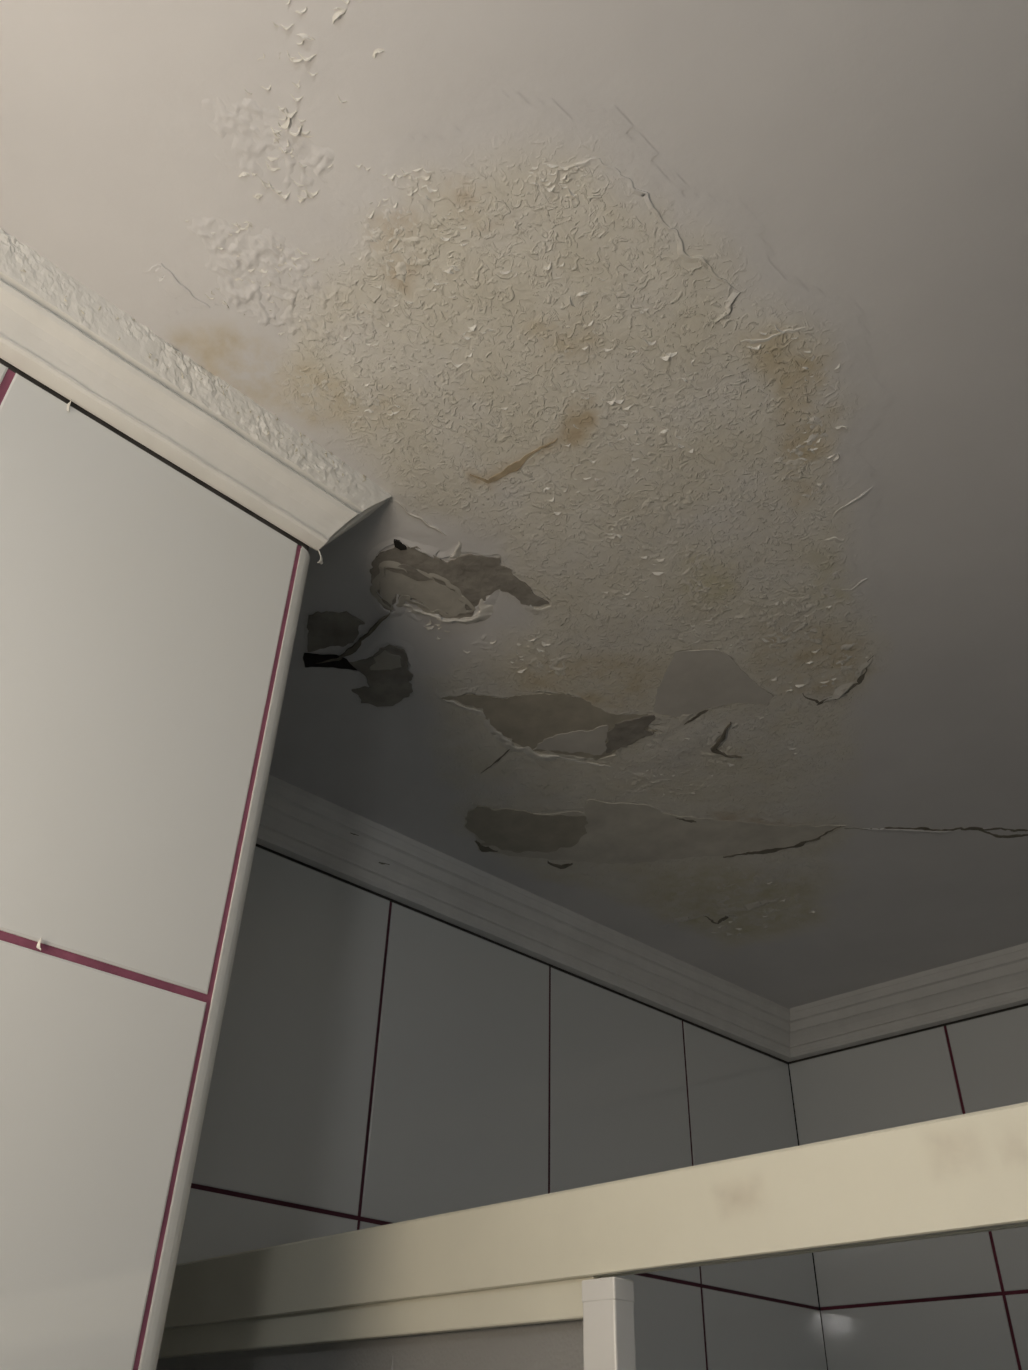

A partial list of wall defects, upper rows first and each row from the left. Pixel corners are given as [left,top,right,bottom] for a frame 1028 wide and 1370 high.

damp [152,91,911,961]
peeling [302,537,559,708]
peeling [435,686,669,768]
peeling [462,797,848,869]
crack [844,827,1028,838]